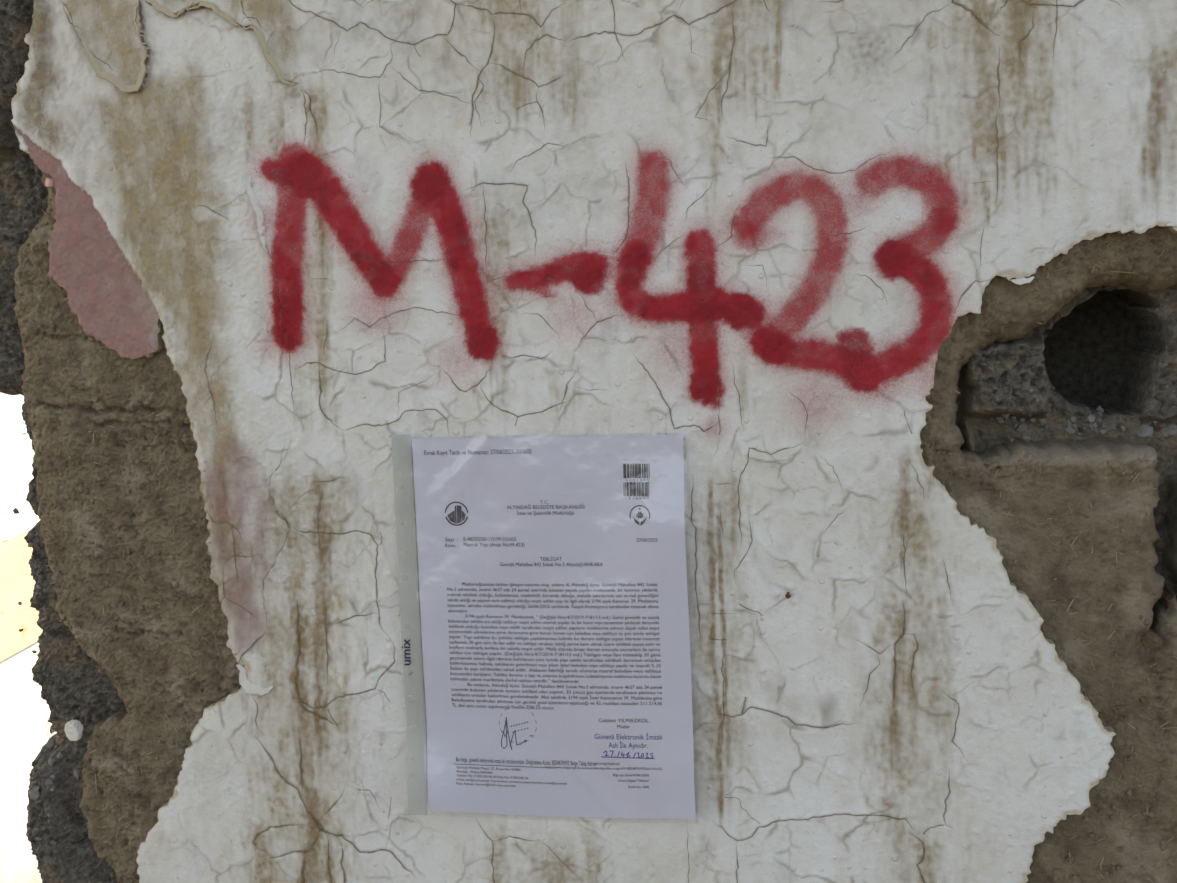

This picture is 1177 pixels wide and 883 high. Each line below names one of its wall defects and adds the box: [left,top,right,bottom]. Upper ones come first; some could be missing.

crack [138,0,203,92]
crack [289,0,768,281]
spalling [0,0,297,883]
water stain [69,0,239,555]
crack [208,480,395,724]
water stain [272,770,335,883]
water stain [290,602,342,750]
water stain [314,480,342,571]
crack [252,703,408,883]
crack [278,290,598,430]
crack [639,362,848,739]
spalling [920,221,1177,883]